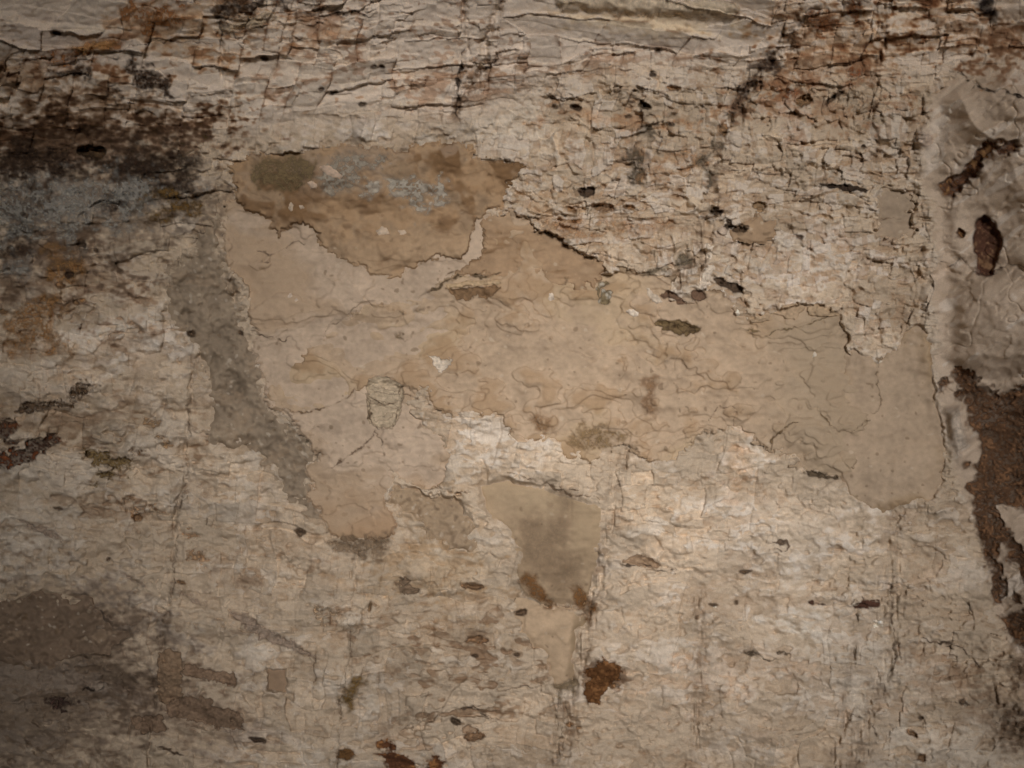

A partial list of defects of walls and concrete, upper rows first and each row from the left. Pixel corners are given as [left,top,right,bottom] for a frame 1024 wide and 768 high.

crack [455,53,499,110]
crack [957,72,1023,98]
water stain [0,173,149,239]
water stain [318,155,447,211]
spalling [820,183,868,193]
spalling [446,280,502,301]
spalling [654,319,700,336]
spalling [646,243,743,304]
peeling [736,302,839,323]
spalling [366,376,404,429]
spalling [807,470,838,480]
corrosion [583,656,623,705]